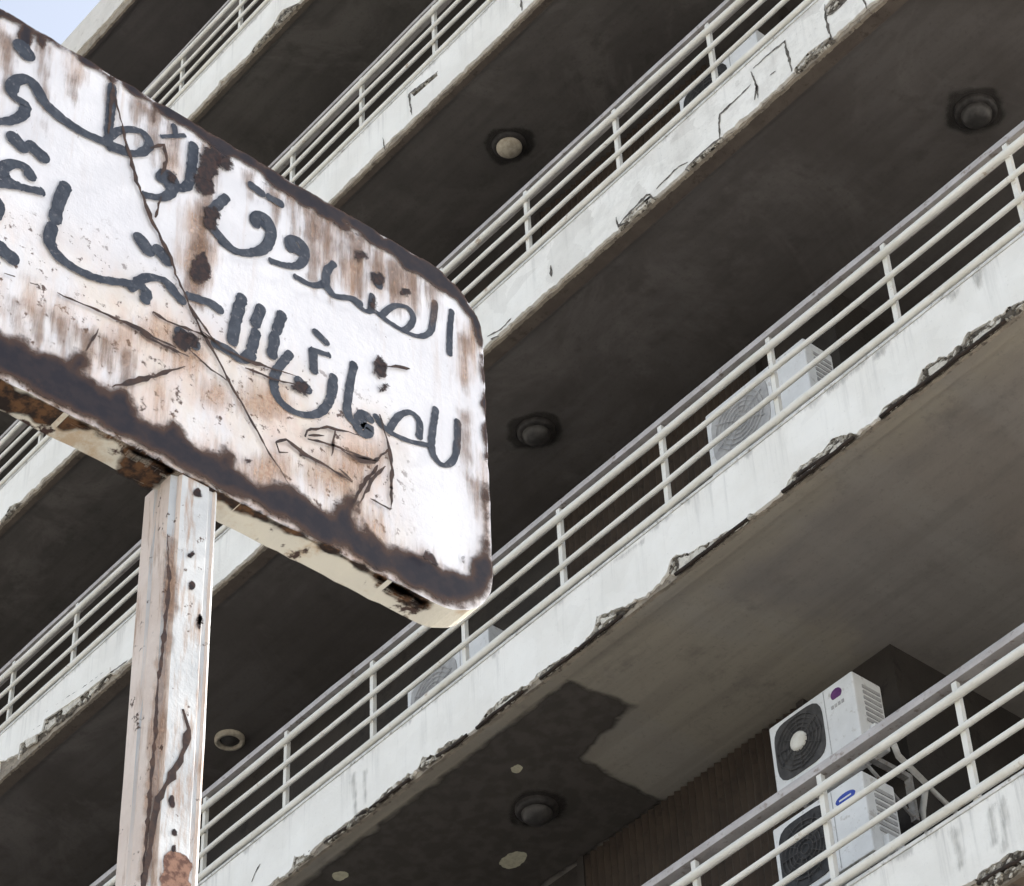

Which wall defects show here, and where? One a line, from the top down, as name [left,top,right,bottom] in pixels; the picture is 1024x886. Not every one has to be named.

crack [824,0,867,40]
crack [616,40,792,228]
spalling [879,302,1024,420]
spalling [781,433,858,494]
spalling [669,512,759,576]
corrosion [140,534,196,886]
water stain [305,681,661,886]
spalling [975,851,1024,886]